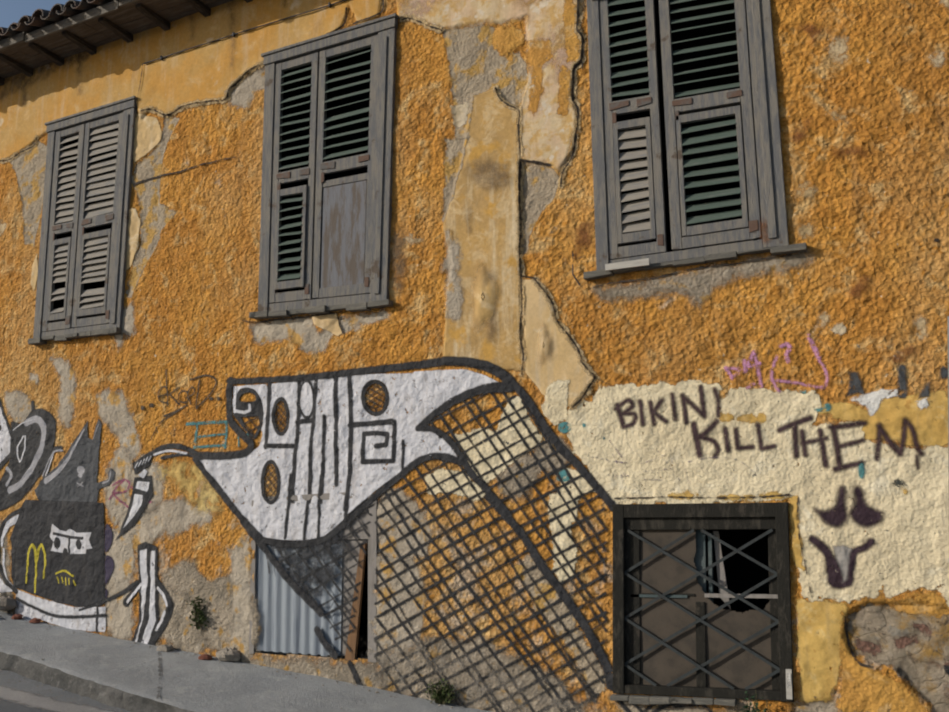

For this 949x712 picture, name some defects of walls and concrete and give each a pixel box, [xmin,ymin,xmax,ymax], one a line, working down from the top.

crack [136,61,264,118]
spalling [226,66,265,109]
crack [0,134,38,164]
spalling [10,140,47,291]
spalling [114,113,180,346]
crack [133,157,235,185]
spalling [442,24,529,320]
spalling [520,162,560,255]
crack [492,0,610,410]
spalling [593,252,813,306]
spalling [249,311,389,353]
spalling [847,603,949,712]